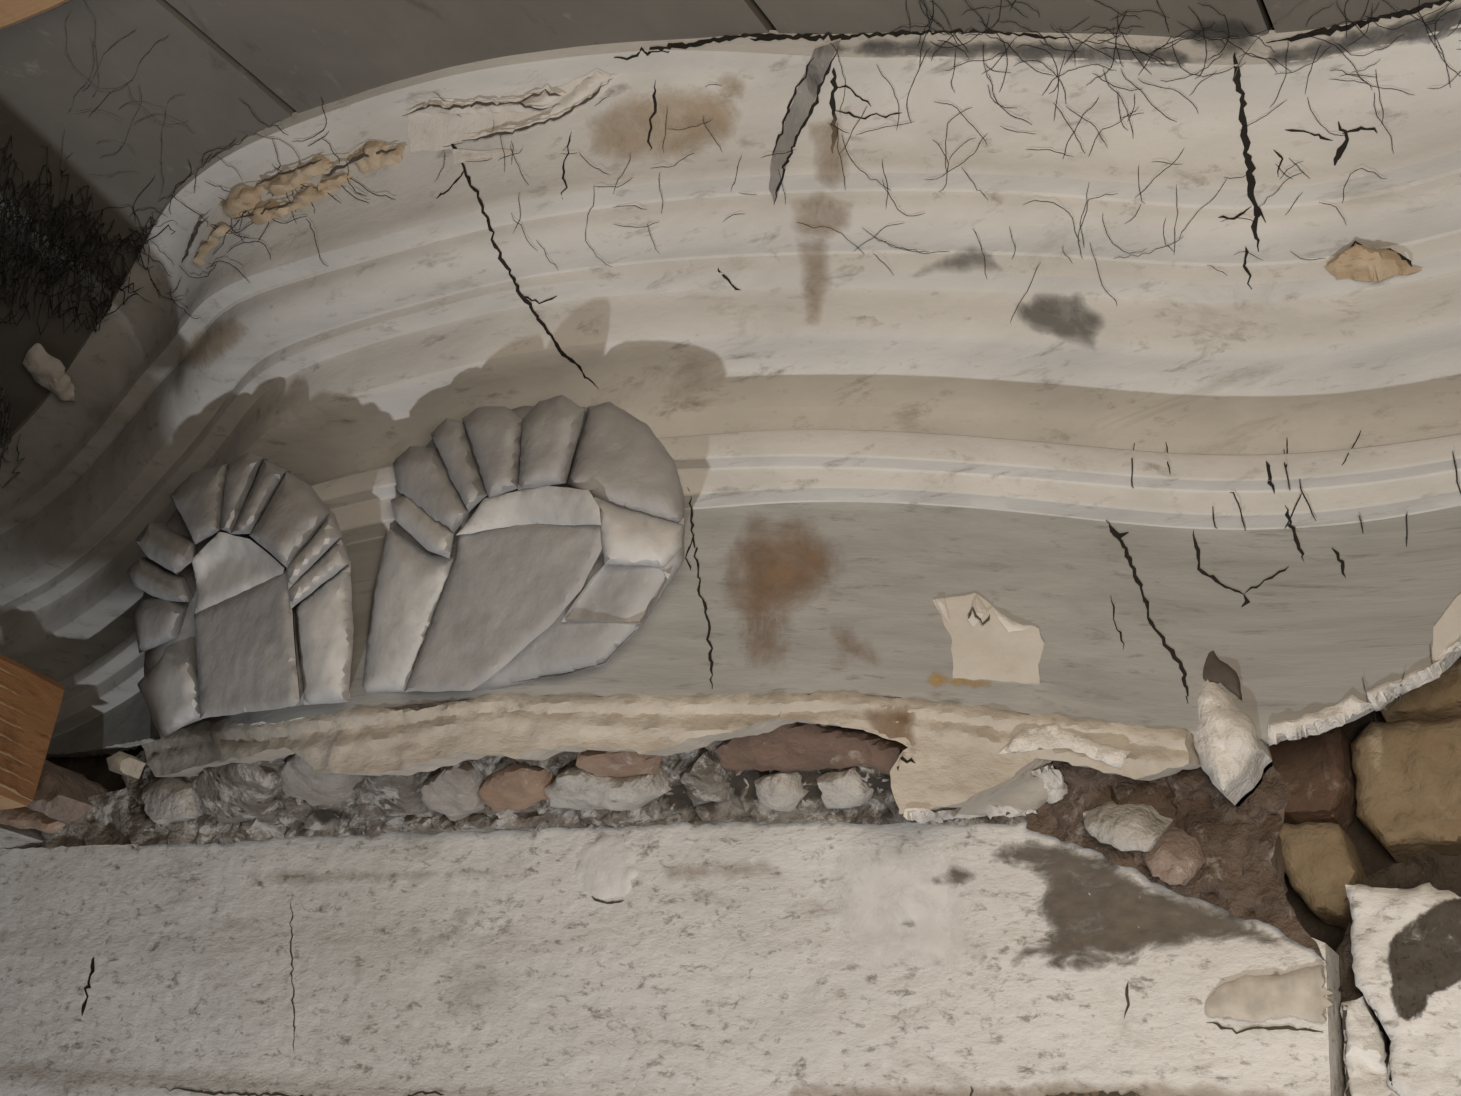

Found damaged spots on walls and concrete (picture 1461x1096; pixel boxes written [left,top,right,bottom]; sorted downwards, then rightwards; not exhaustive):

peeling [181,69,617,268]
water stain [605,102,726,149]
crack [614,29,1070,153]
crack [1218,0,1452,289]
crack [437,144,598,388]
peeling [1324,241,1422,282]
peeling [932,593,1044,684]
crack [1106,520,1189,703]
flaking render [1268,594,1461,746]
flaking render [903,725,1131,824]
water stain [996,844,1273,969]
crack [1338,928,1393,1096]